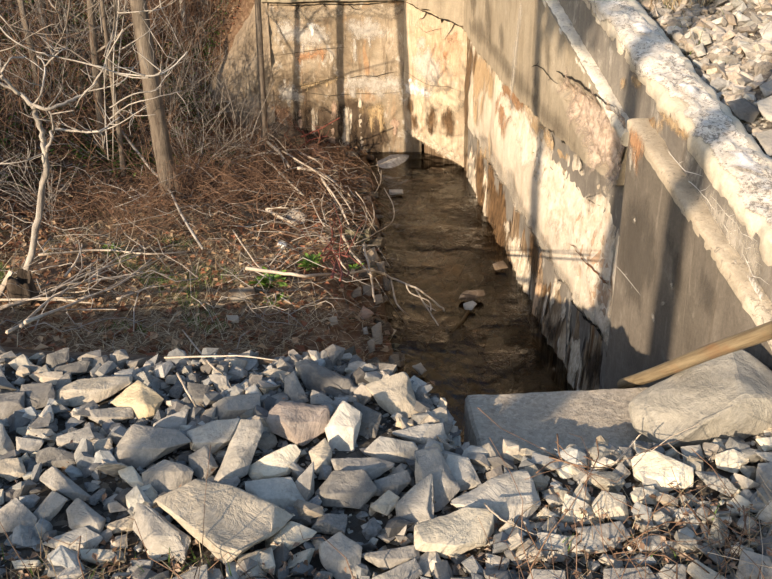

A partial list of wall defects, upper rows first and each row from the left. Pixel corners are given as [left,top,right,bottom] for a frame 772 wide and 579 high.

damp [278,22,329,52]
damp [348,17,383,61]
crack [279,0,463,39]
damp [412,38,443,83]
damp [280,45,477,152]
rust [473,58,568,160]
crack [532,63,615,108]
rust [573,215,611,315]